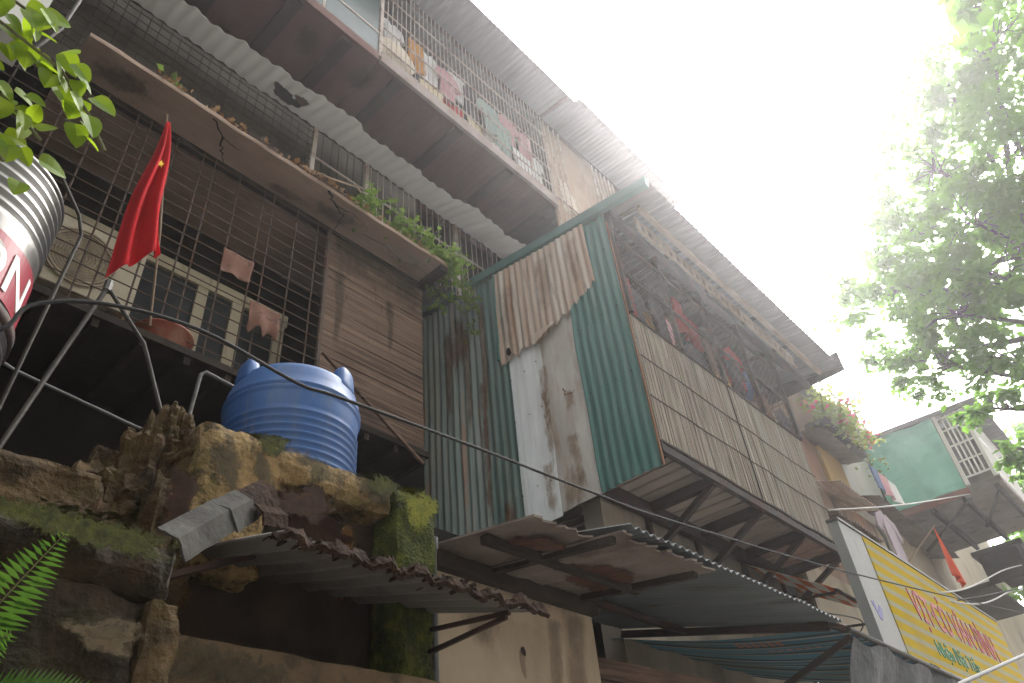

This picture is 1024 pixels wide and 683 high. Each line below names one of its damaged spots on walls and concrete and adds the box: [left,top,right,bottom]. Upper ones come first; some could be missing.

crack [213,118,243,162]
rust [444,305,491,504]